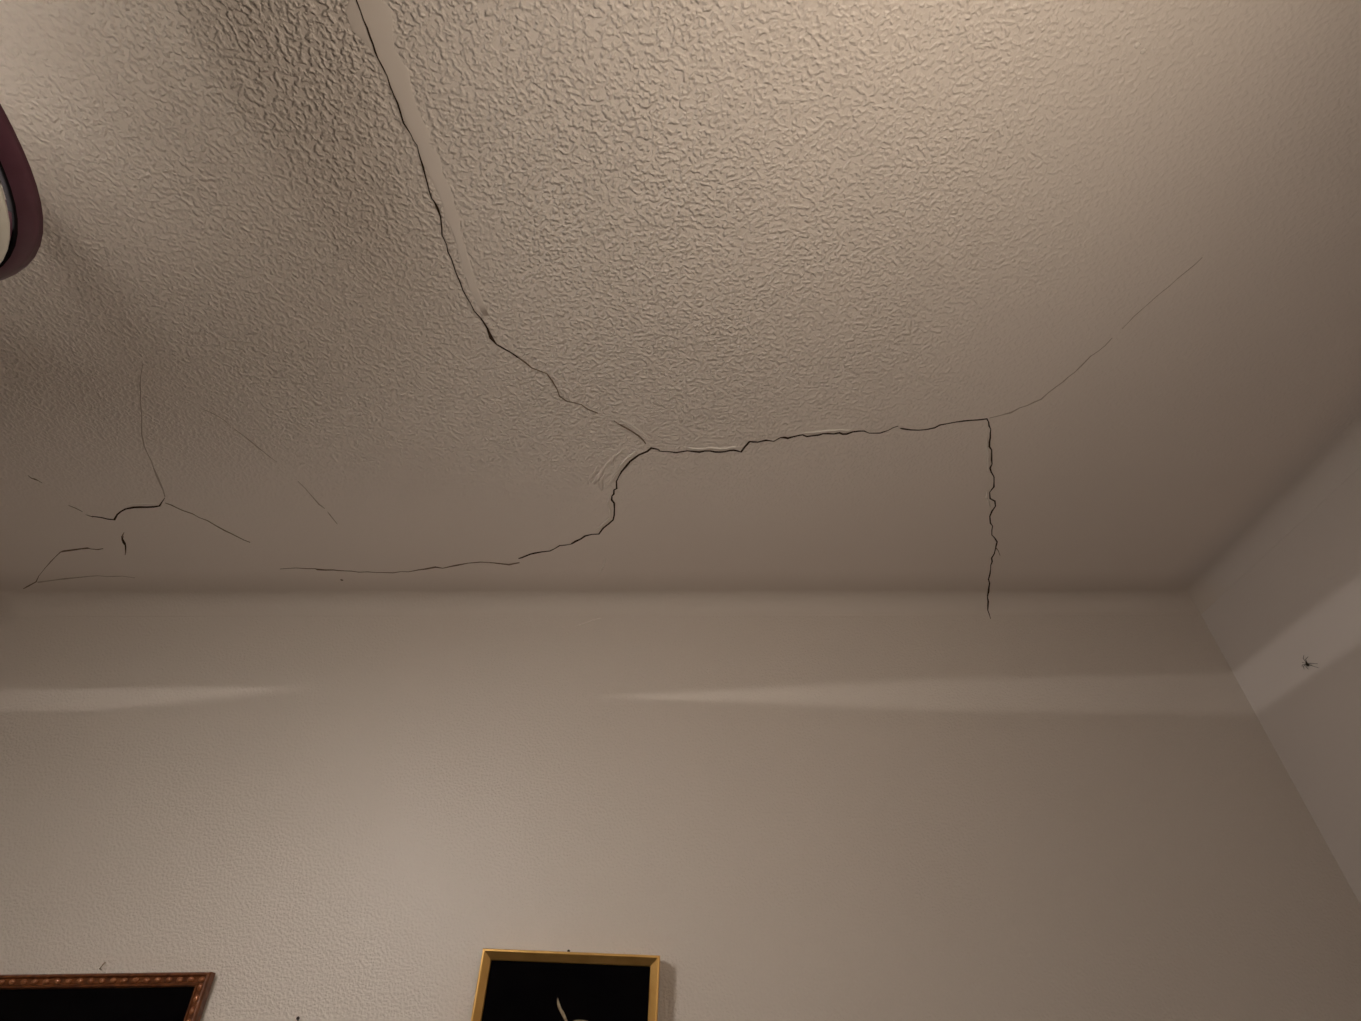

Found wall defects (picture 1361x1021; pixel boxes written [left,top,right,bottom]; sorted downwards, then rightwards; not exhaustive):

crack [283,0,1202,619]